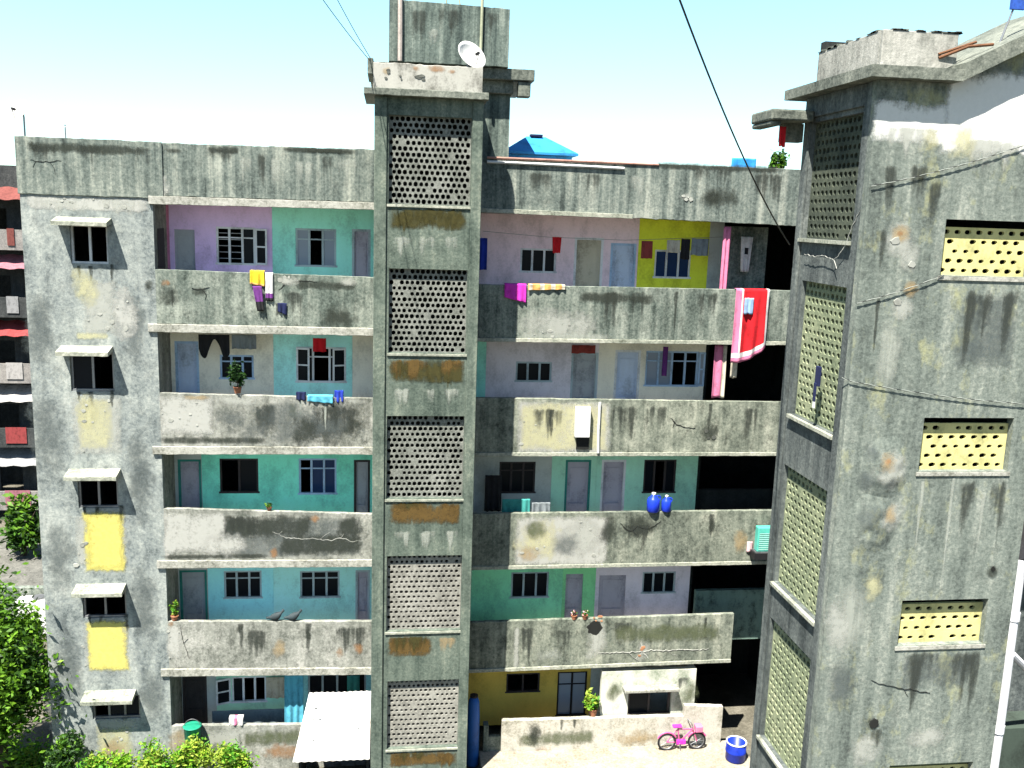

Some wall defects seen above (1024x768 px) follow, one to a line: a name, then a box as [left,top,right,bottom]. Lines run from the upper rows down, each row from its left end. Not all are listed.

damp [886,167,896,197]
damp [912,166,940,214]
corrosion [392,210,465,230]
crack [807,209,861,269]
corrosion [390,360,463,384]
damp [164,400,365,443]
corrosion [391,503,459,524]
damp [944,478,1005,561]
damp [237,624,265,651]
damp [339,628,363,647]
corrosion [389,637,453,656]